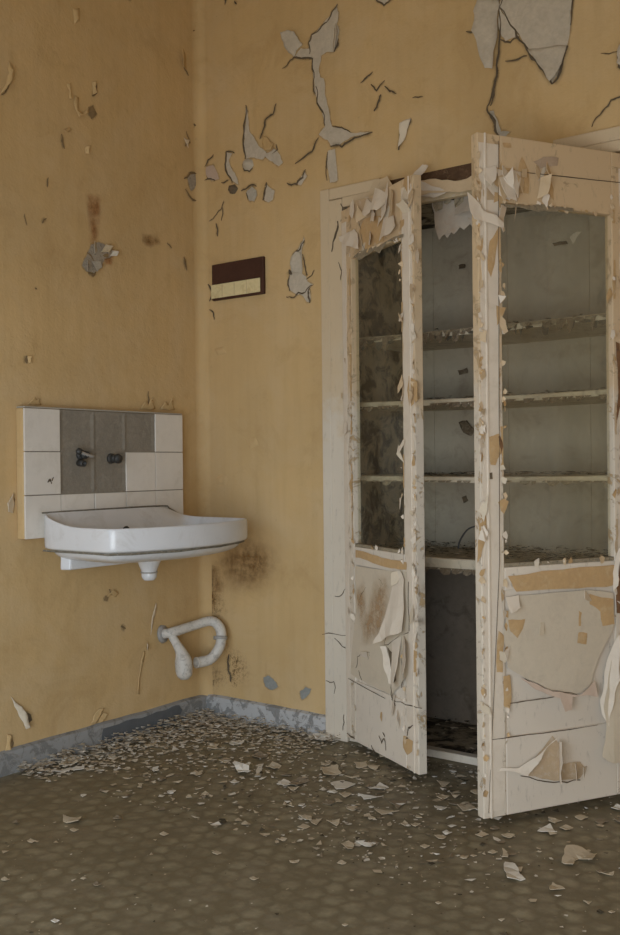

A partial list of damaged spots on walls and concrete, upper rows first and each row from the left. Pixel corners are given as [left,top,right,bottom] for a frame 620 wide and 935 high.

peeling [280,4,372,186]
peeling [466,0,573,136]
peeling [184,104,283,202]
peeling [82,242,119,277]
peeling [287,239,314,303]
peeling [11,697,32,729]